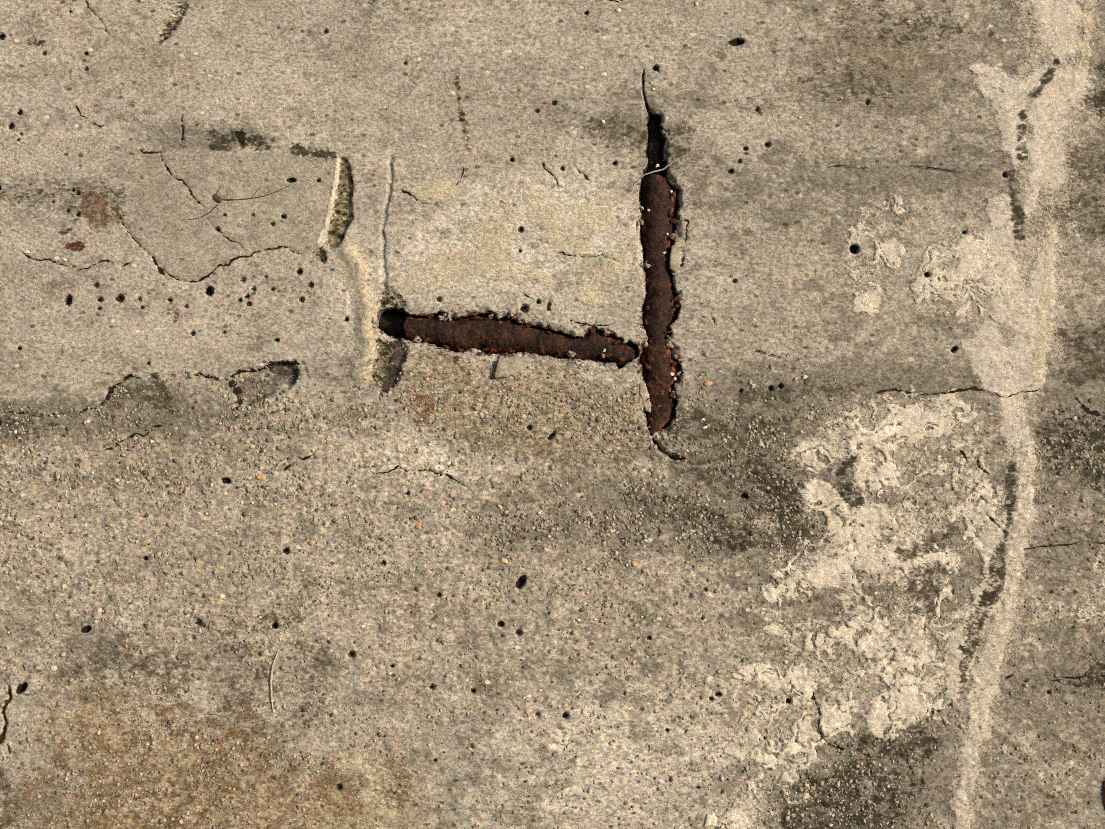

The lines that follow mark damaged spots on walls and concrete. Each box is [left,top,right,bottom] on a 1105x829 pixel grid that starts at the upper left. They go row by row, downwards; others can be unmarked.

crack [25,117,300,282]
rust [423,343,547,362]
rust [410,302,563,333]
rust [581,313,644,373]
crack [195,359,299,411]
rust [413,394,434,421]
leakage [623,0,1105,829]